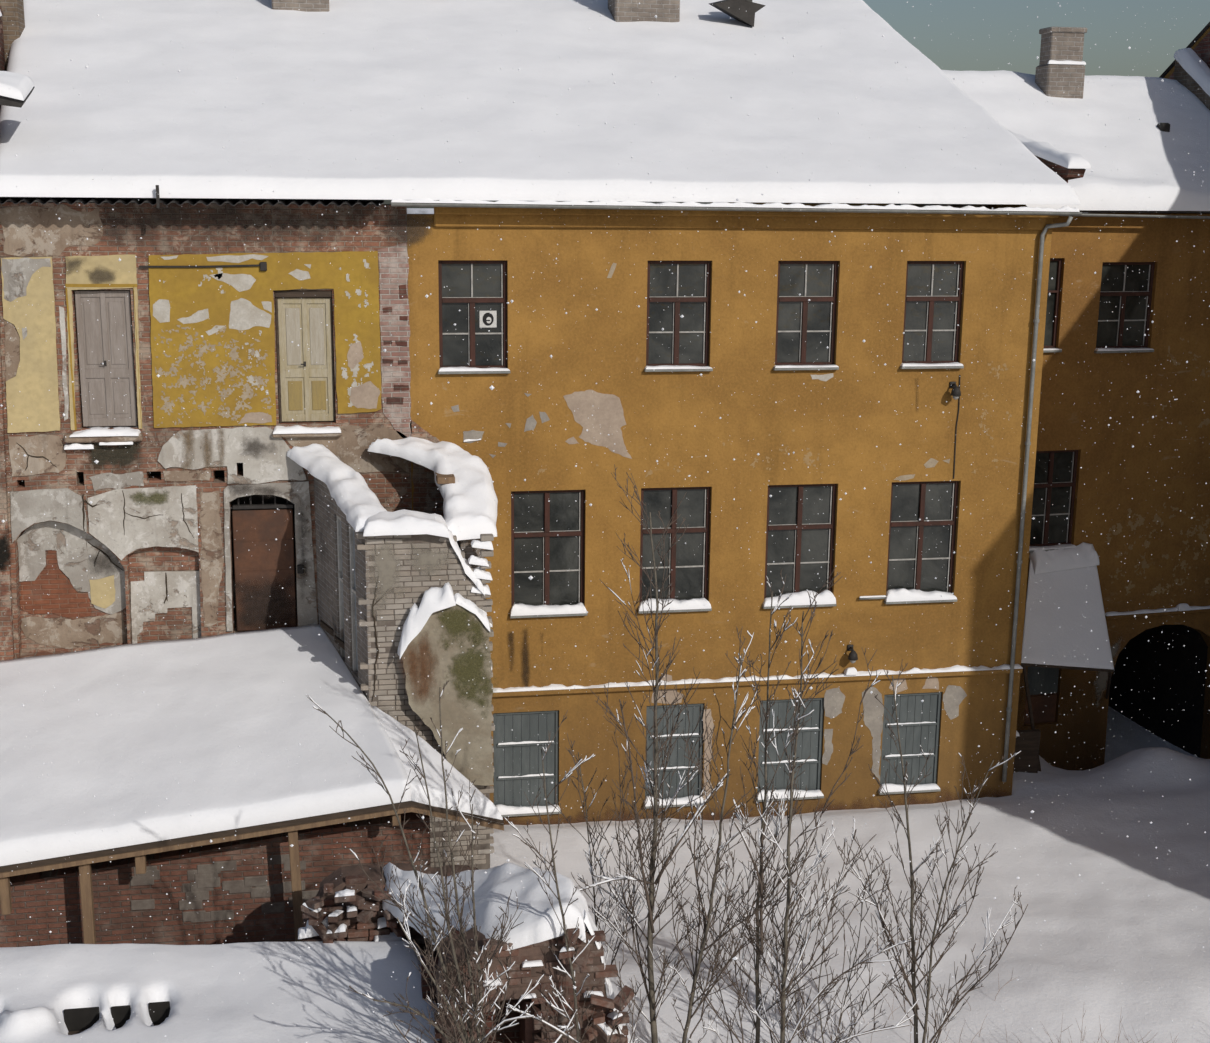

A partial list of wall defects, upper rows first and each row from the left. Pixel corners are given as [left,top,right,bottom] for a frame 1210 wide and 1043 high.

peeling [1,258,51,302]
peeling [289,264,311,280]
peeling [340,267,369,308]
spalling [383,284,408,321]
peeling [153,254,272,426]
flaking render [563,390,632,459]
crack [82,490,194,571]
crack [162,573,170,604]
flaking render [822,687,845,765]
flaking render [862,677,967,781]